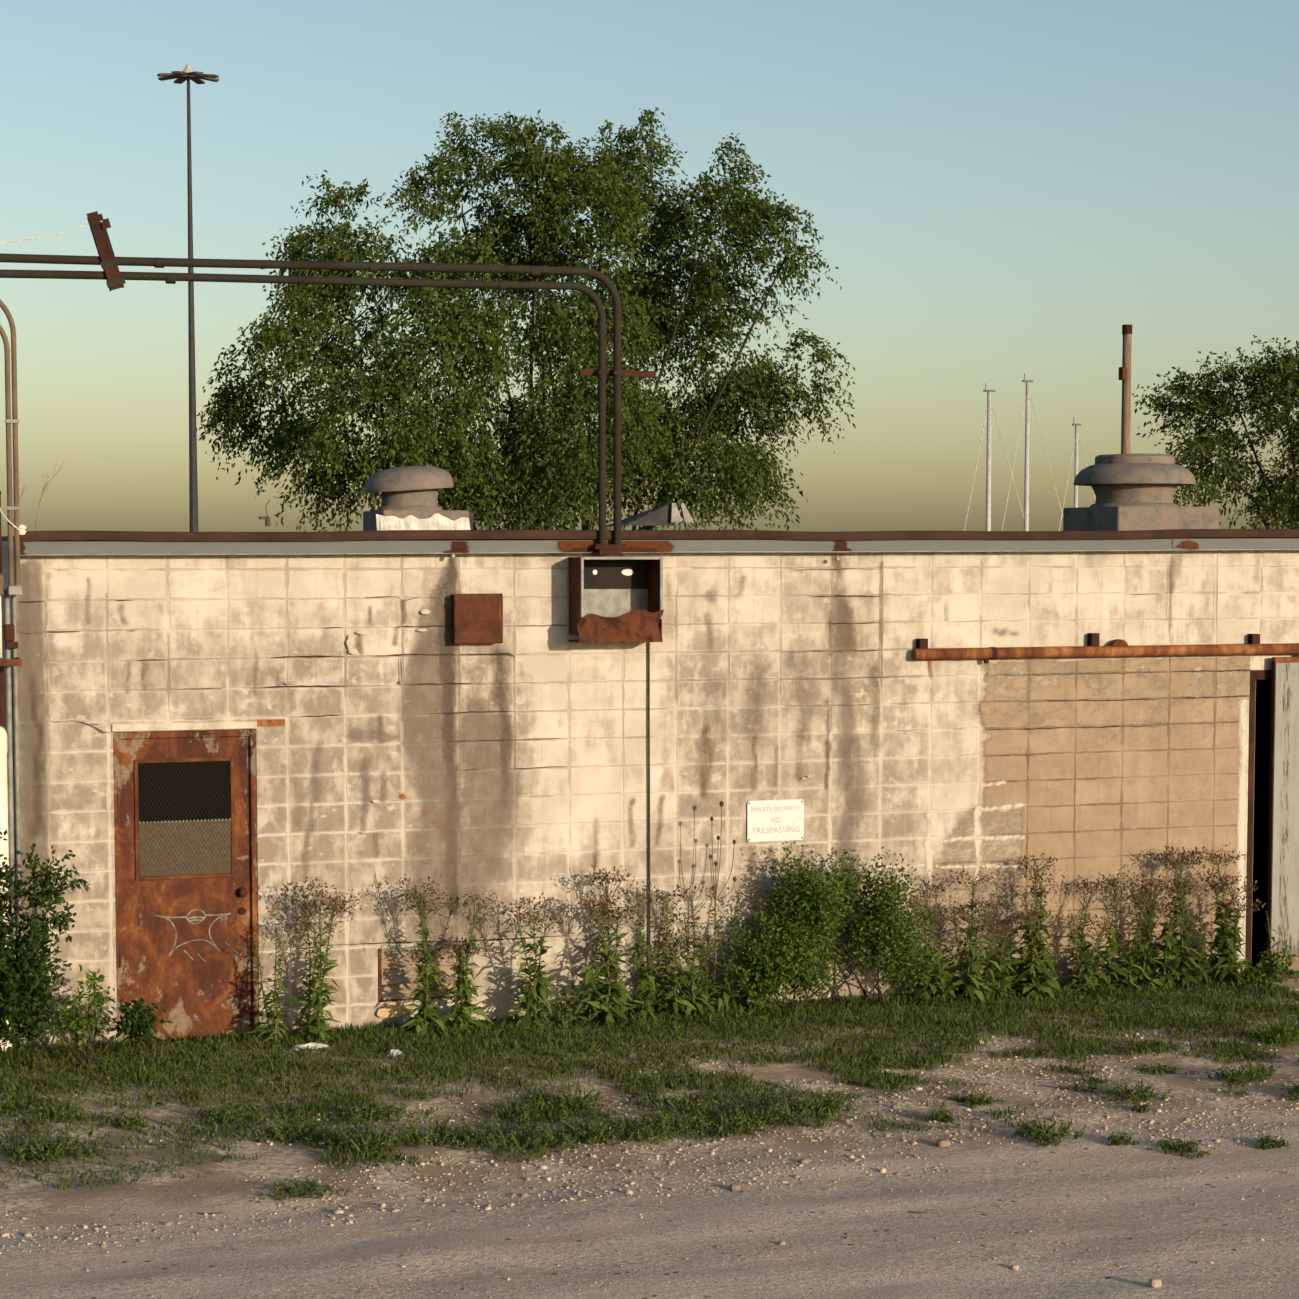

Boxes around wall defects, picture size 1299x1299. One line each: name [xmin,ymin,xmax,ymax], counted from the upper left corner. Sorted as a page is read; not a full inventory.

water stain [835,594,856,662]
water stain [404,557,518,946]
water stain [826,685,864,872]